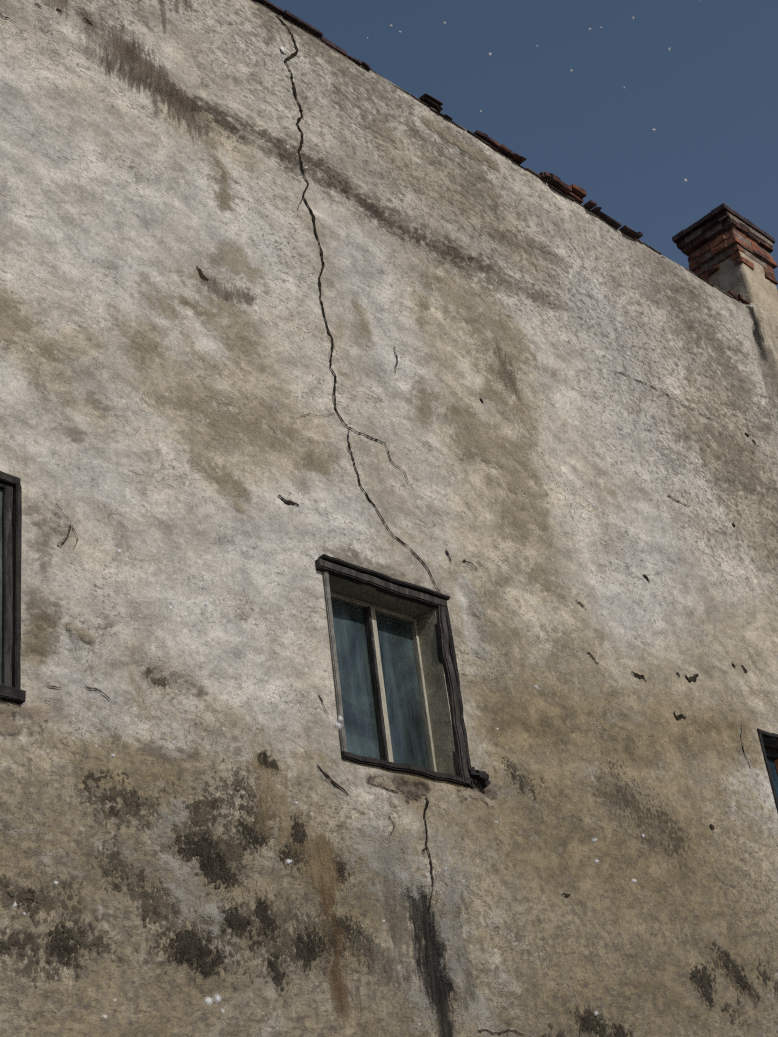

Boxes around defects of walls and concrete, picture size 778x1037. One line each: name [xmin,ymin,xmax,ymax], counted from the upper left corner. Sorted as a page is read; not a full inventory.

leakage [83,16,536,426]
crack [276,14,478,592]
mould [82,768,142,820]
mould [257,749,279,774]
mould [0,873,110,977]
mould [105,780,375,996]
crack [422,797,434,913]
leakage [405,886,457,1037]
mould [688,937,778,1026]